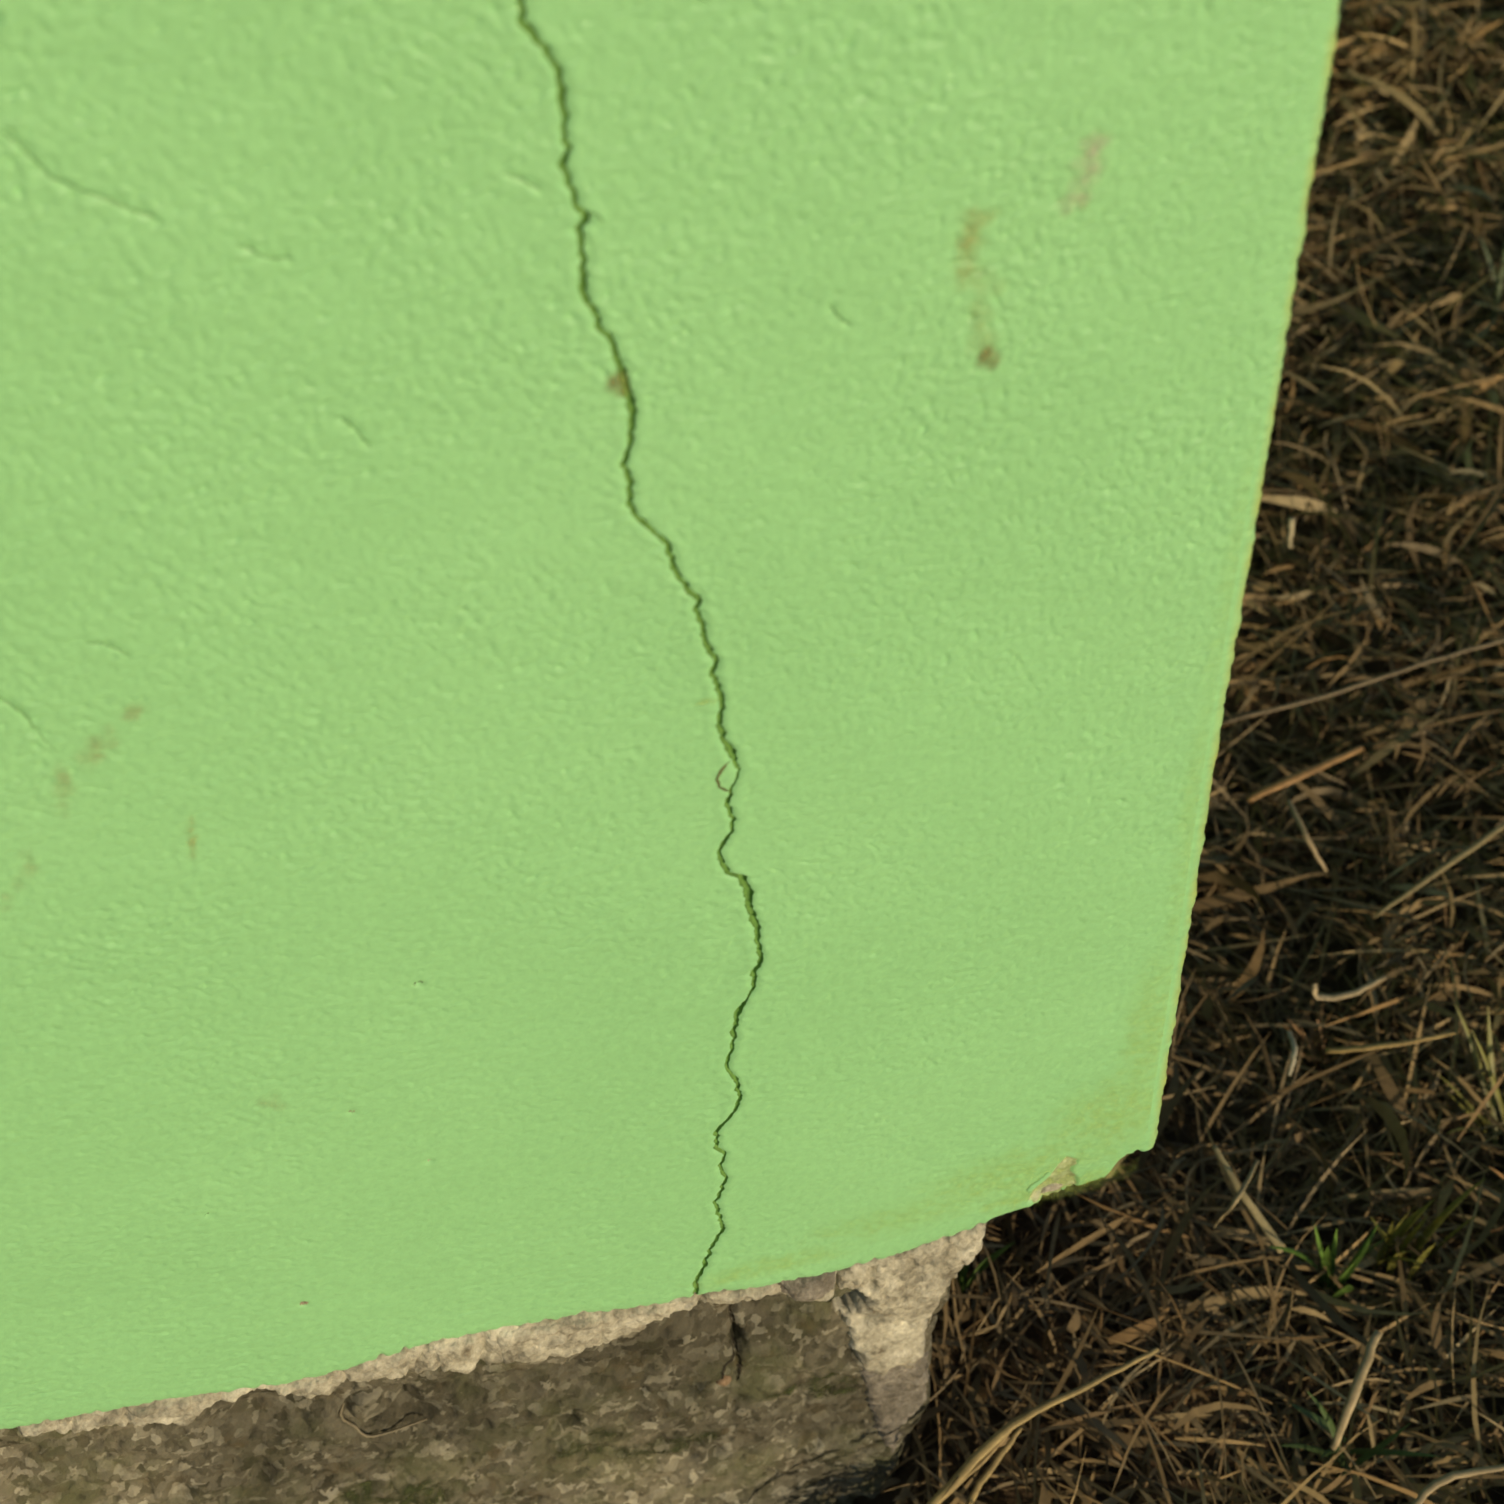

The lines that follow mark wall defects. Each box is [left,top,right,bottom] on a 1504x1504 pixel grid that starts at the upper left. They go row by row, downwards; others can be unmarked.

flaking render [17,1222,987,1453]
crack [516,0,764,1381]